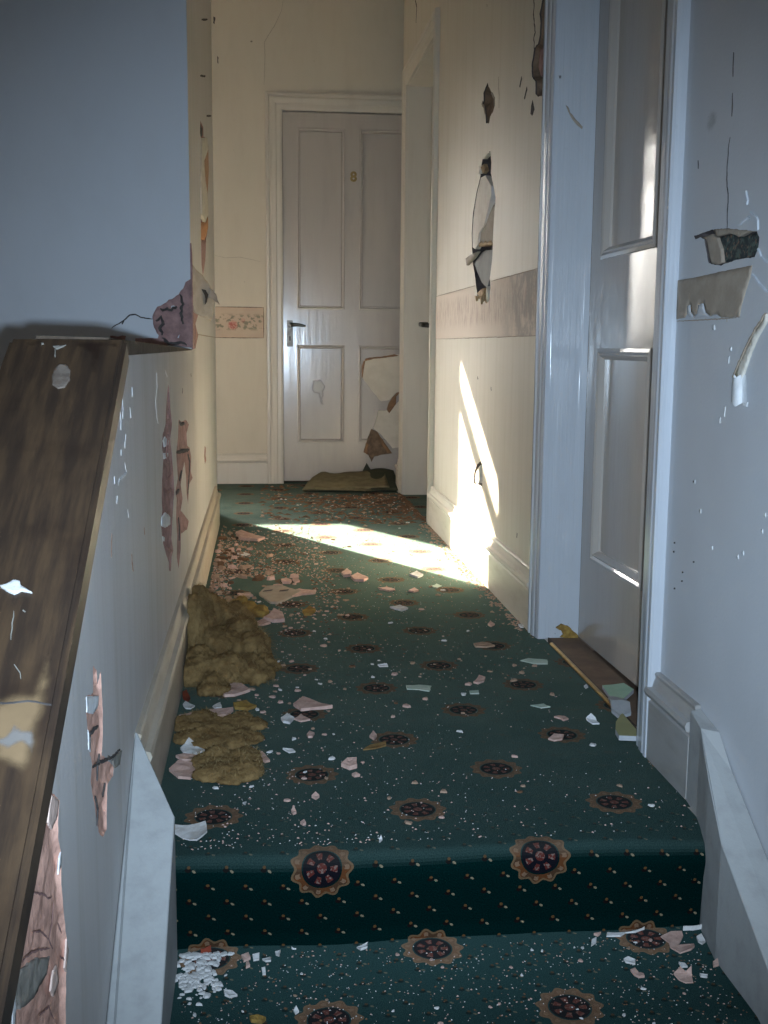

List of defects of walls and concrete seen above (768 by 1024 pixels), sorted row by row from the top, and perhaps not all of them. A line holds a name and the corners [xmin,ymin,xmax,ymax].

spalling [481,86,495,123]
spalling [533,0,545,96]
crack [726,52,734,227]
flaking render [110,243,198,350]
spalling [466,152,496,304]
peeling [676,191,768,330]
flaking render [161,385,192,571]
flaking render [86,666,122,837]